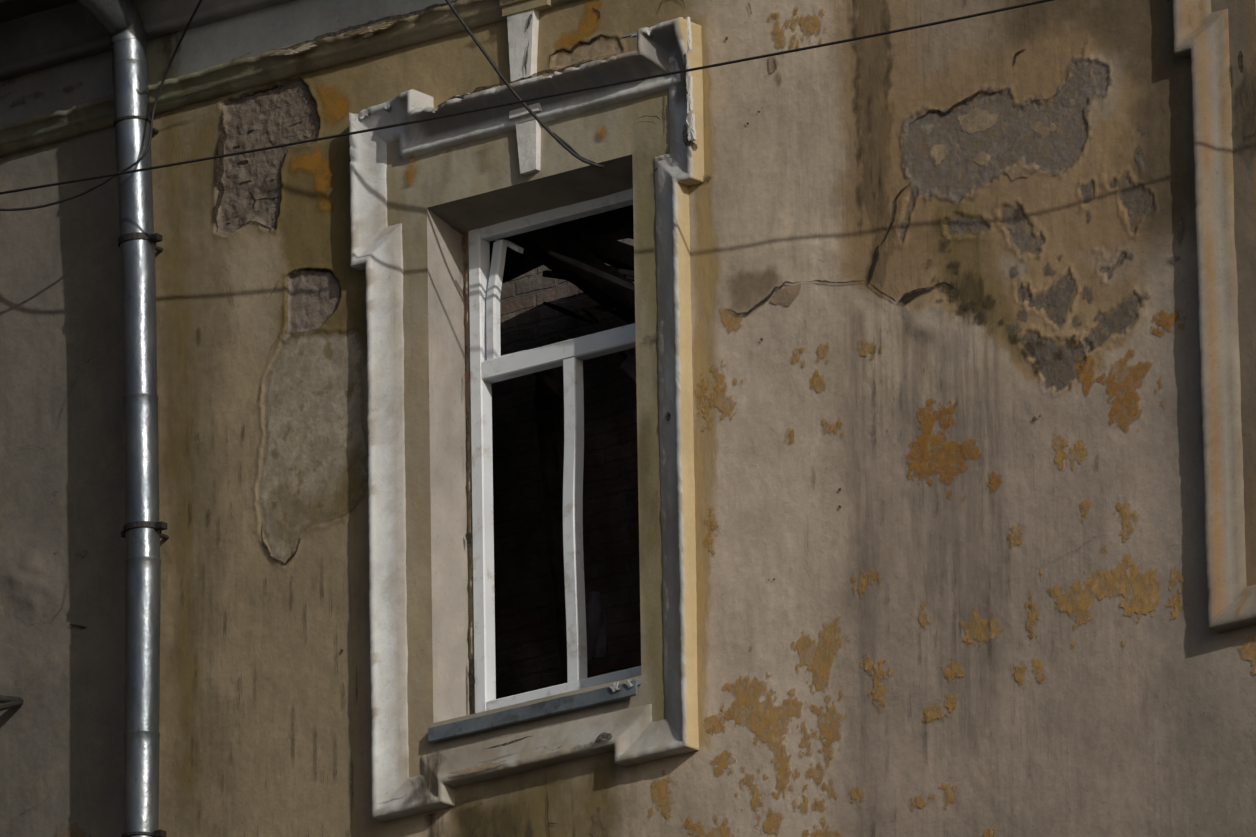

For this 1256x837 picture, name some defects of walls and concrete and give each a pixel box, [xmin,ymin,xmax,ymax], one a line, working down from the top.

spalling [214,78,320,235]
peeling [437,25,657,107]
spalling [681,17,698,151]
crack [724,139,957,315]
leakage [853,0,896,286]
peeling [898,57,1112,242]
peeling [1003,207,1164,431]
peeling [259,267,368,565]
peeling [907,399,982,501]
peeling [1048,502,1185,647]
leakage [380,750,441,837]
peeling [704,615,864,837]